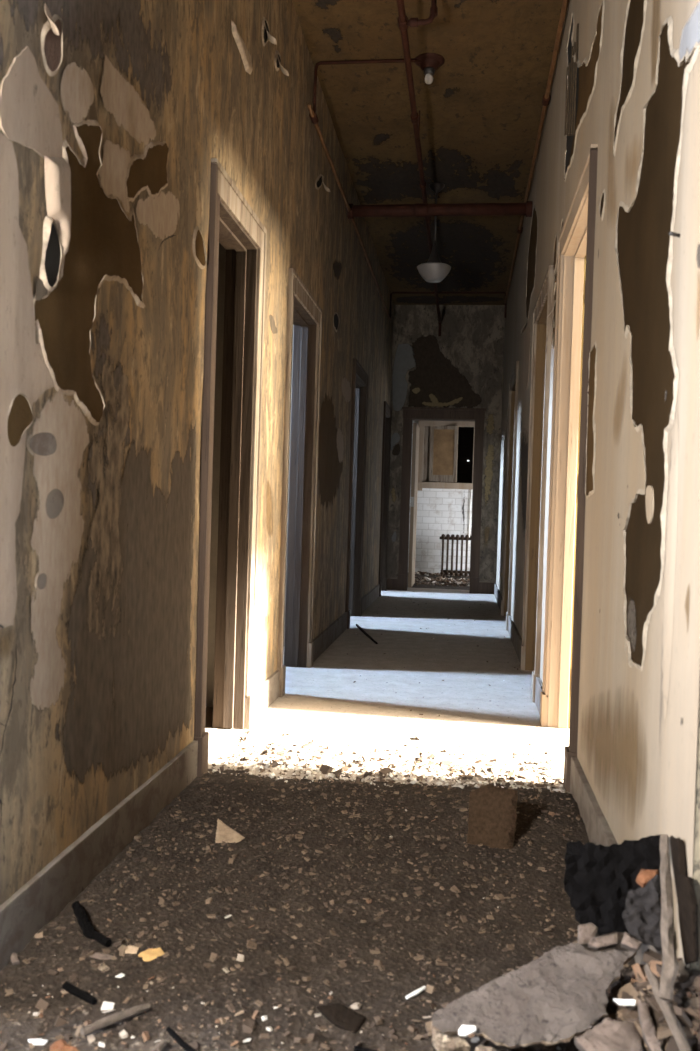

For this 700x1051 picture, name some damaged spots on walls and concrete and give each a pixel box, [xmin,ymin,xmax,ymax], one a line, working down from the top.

peeling [192,226,207,269]
water stain [352,134,525,204]
peeling [564,0,605,182]
peeling [613,0,700,671]